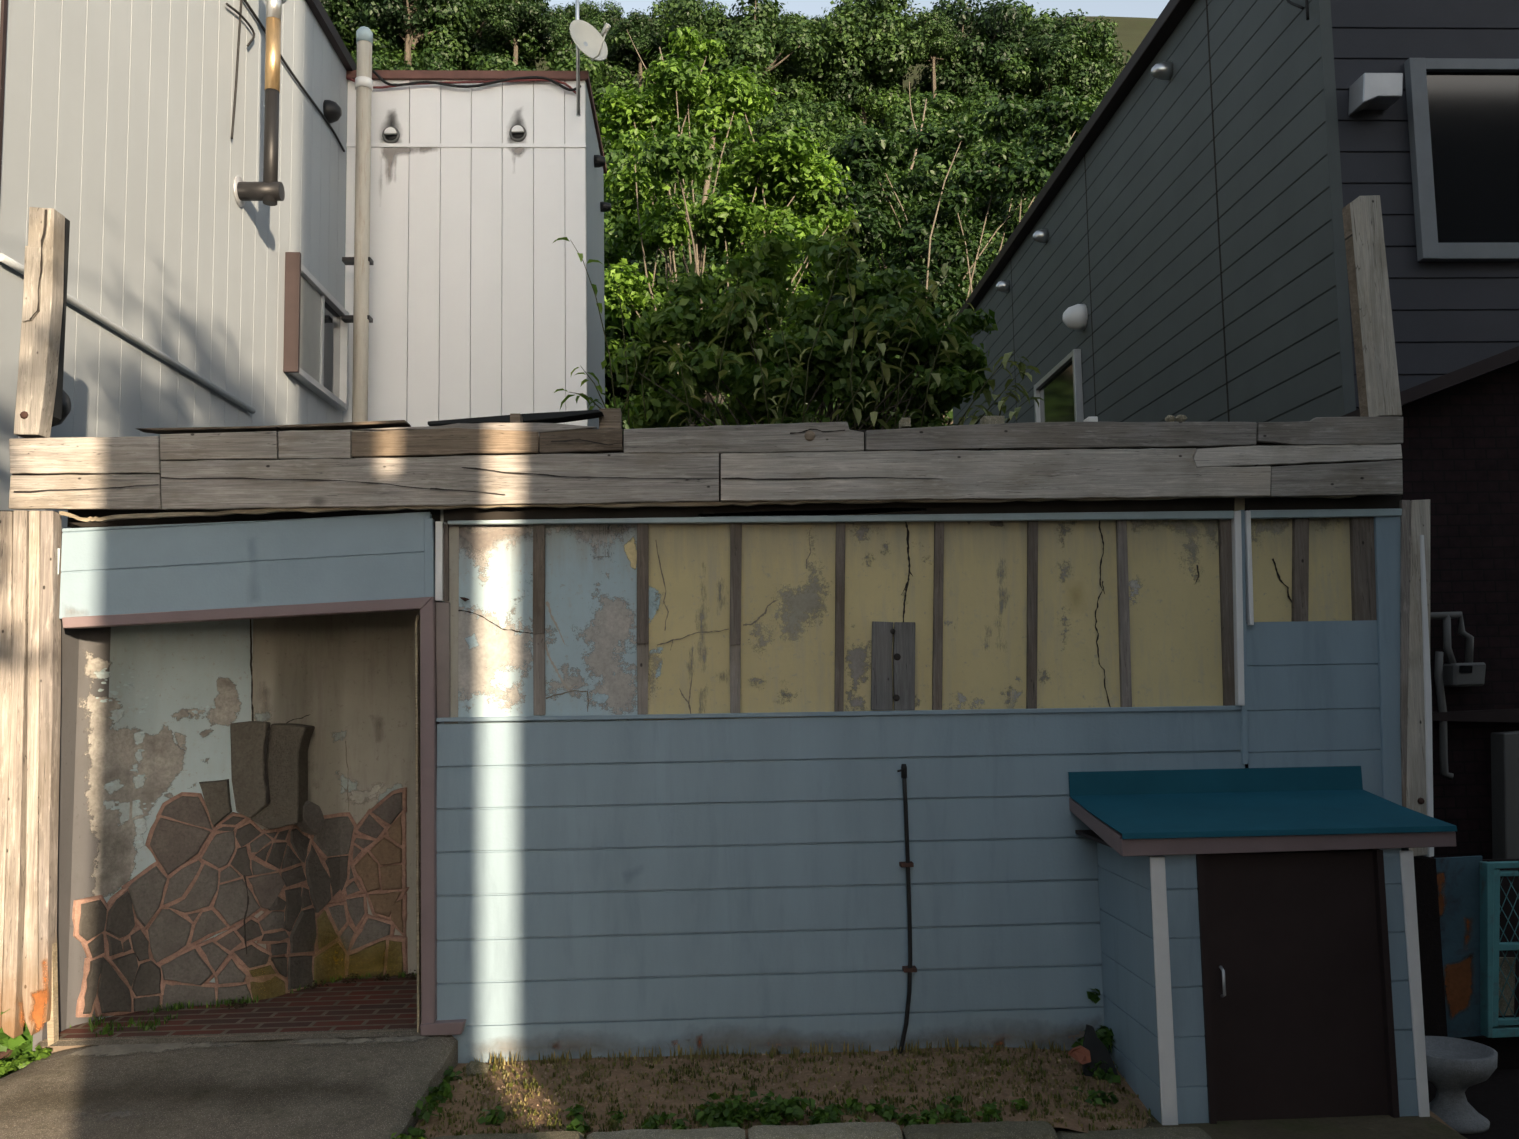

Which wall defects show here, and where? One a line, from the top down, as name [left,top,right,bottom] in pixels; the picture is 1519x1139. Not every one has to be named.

peeling [442,523,664,721]
crack [655,540,777,714]
peeling [748,567,829,648]
crack [901,522,913,622]
crack [1095,520,1110,706]
peeling [78,649,271,897]